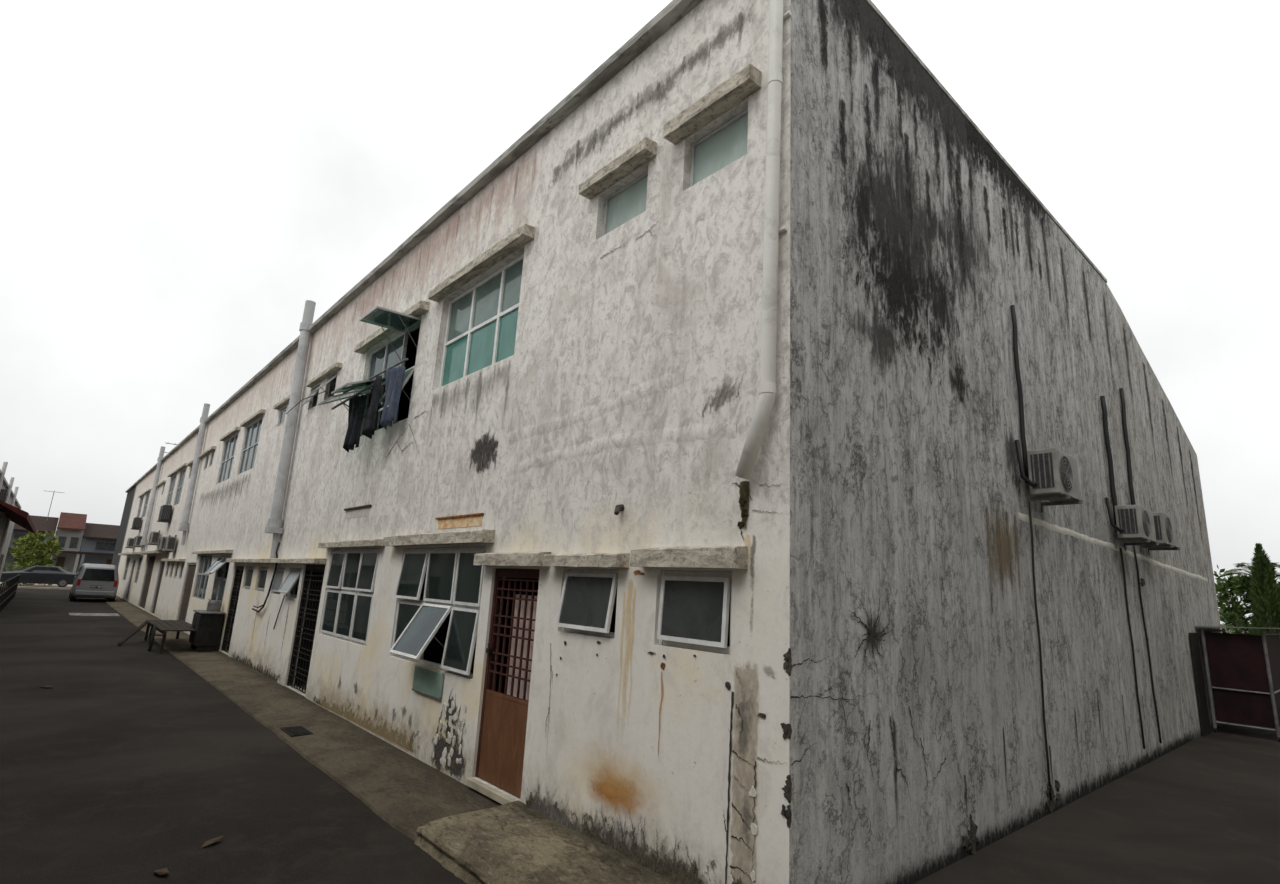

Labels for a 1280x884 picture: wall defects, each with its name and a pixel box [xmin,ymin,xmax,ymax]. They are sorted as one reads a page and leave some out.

water stain [812,0,1069,413]
water stain [469,433,498,473]
water stain [1083,272,1202,535]
water stain [232,653,281,682]
water stain [313,679,419,752]
peeling [431,690,467,779]
corrosion [597,775,634,810]
water stain [526,779,717,884]
corrosion [658,654,666,755]
crack [723,682,734,884]
crack [791,520,997,824]